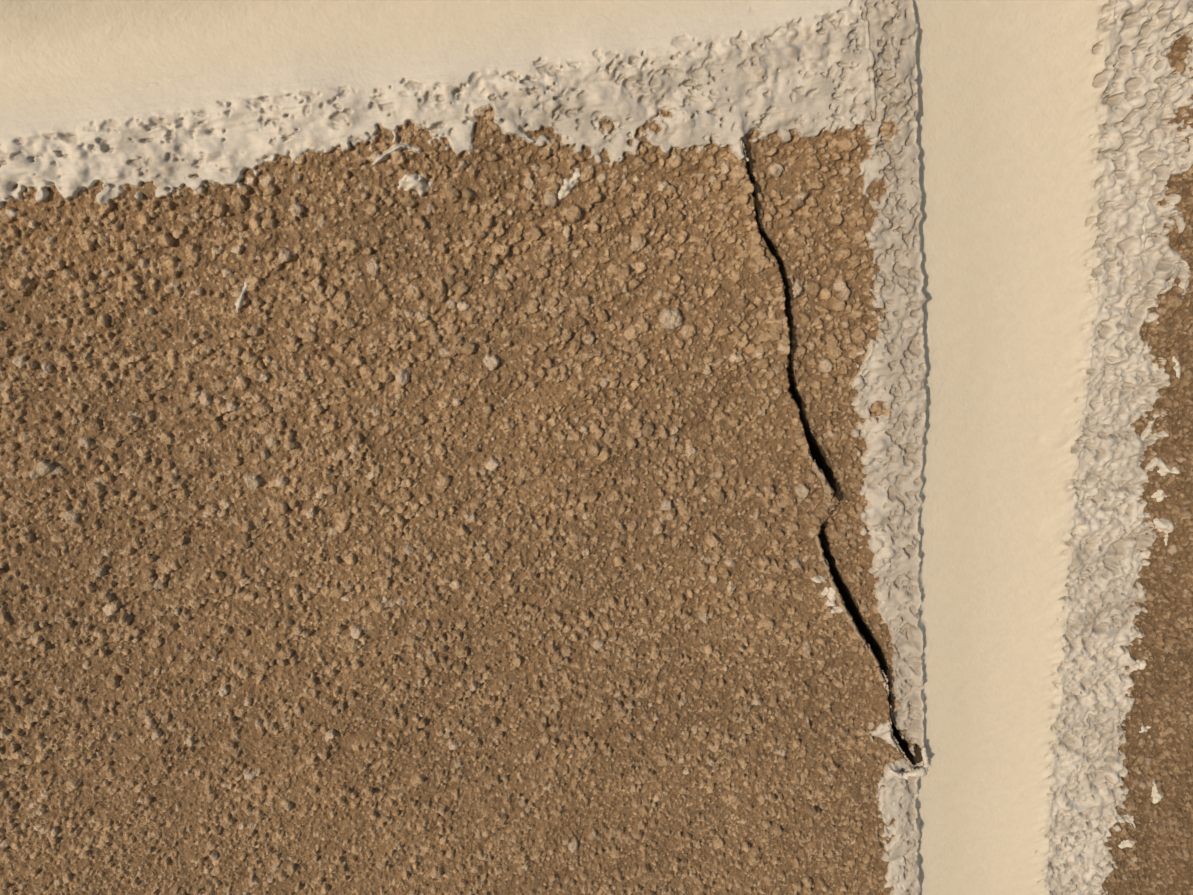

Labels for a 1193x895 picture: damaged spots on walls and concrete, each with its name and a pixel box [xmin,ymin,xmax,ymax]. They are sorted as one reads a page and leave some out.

crack [741,140,924,769]